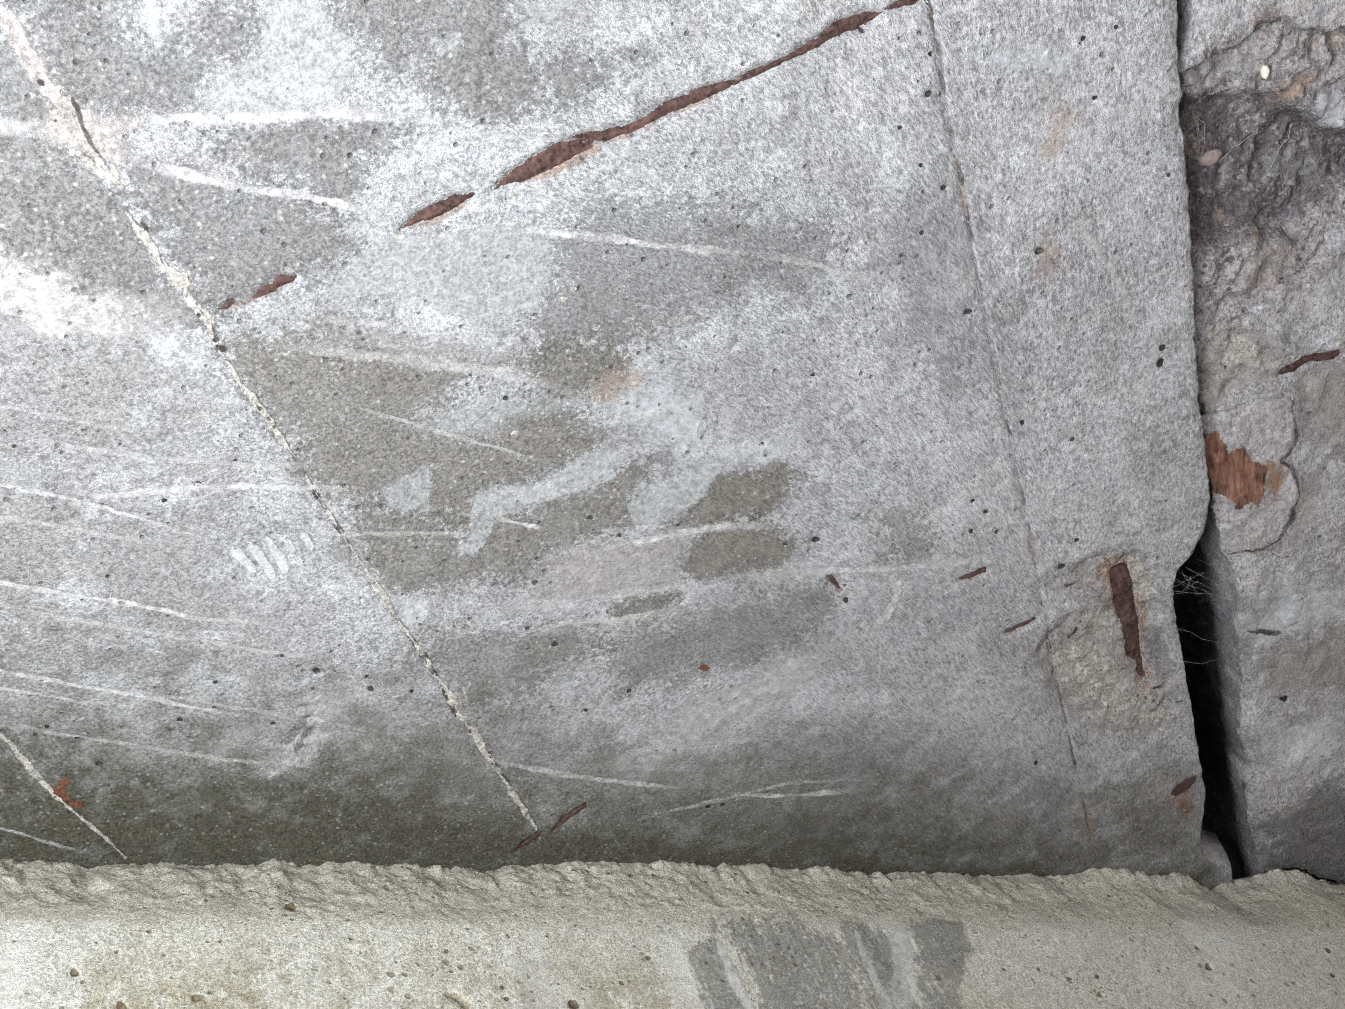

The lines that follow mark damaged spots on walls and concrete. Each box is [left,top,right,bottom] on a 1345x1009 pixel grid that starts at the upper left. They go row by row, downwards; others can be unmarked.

crack [0,733,128,858]
crack [0,5,538,830]